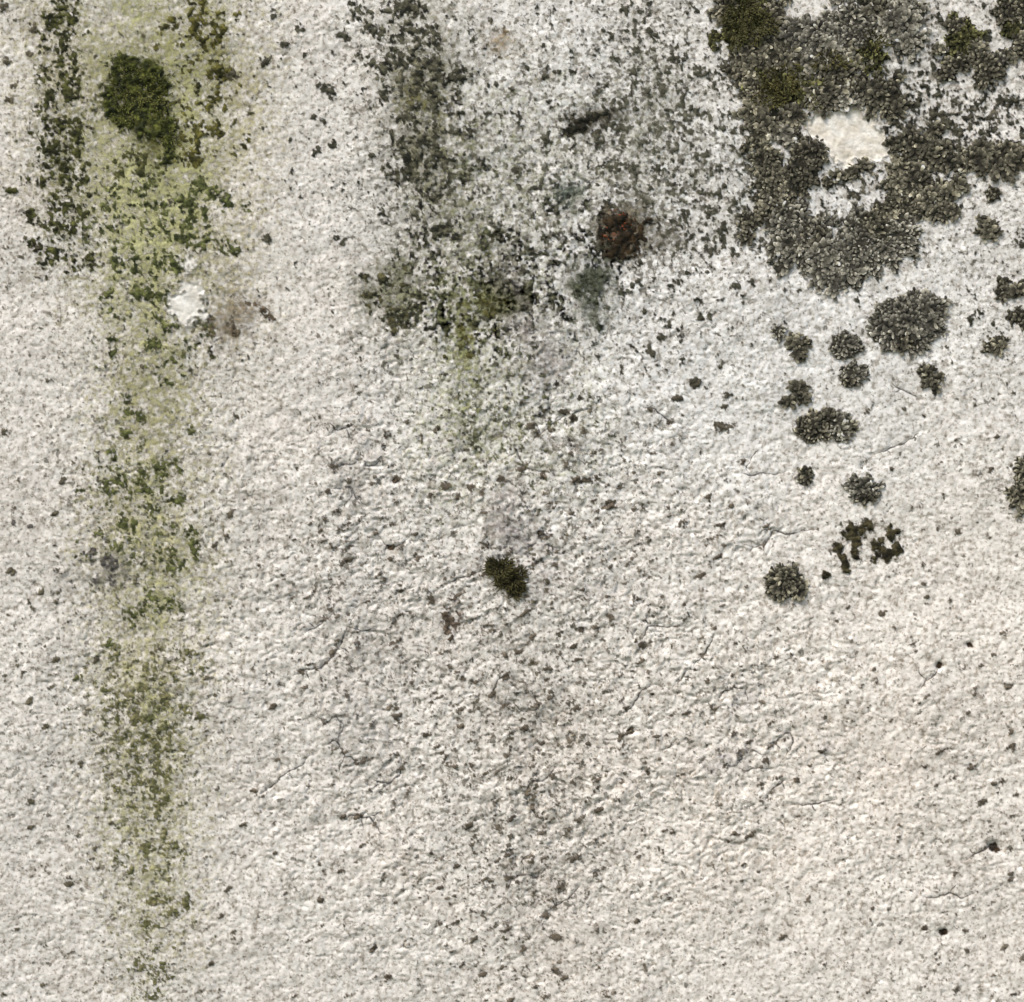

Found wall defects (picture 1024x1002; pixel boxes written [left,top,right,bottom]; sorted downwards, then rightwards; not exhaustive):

mould [559,109,628,136]
rust [595,201,676,260]
damp [208,300,276,339]
damp [68,0,237,833]